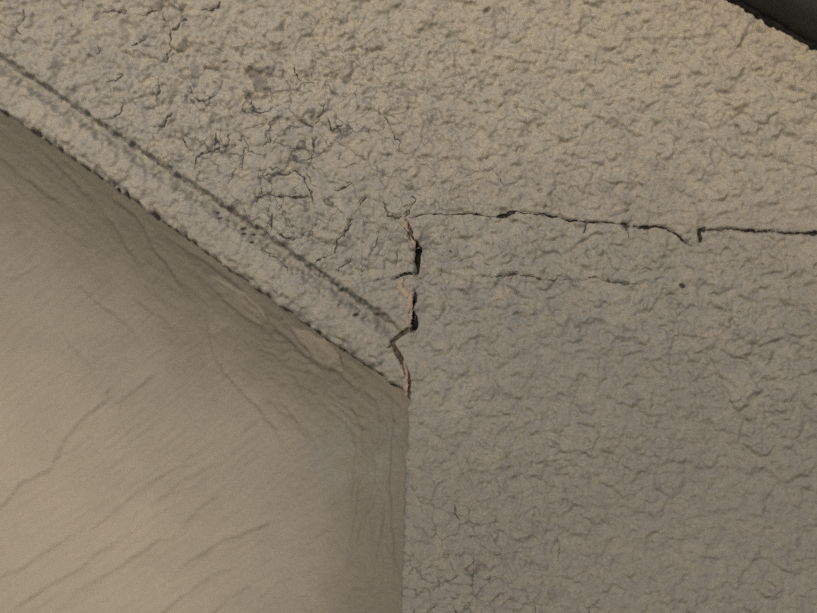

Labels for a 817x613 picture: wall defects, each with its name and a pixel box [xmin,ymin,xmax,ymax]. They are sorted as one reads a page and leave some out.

crack [82,1,221,96]
crack [183,66,342,271]
crack [314,196,817,399]